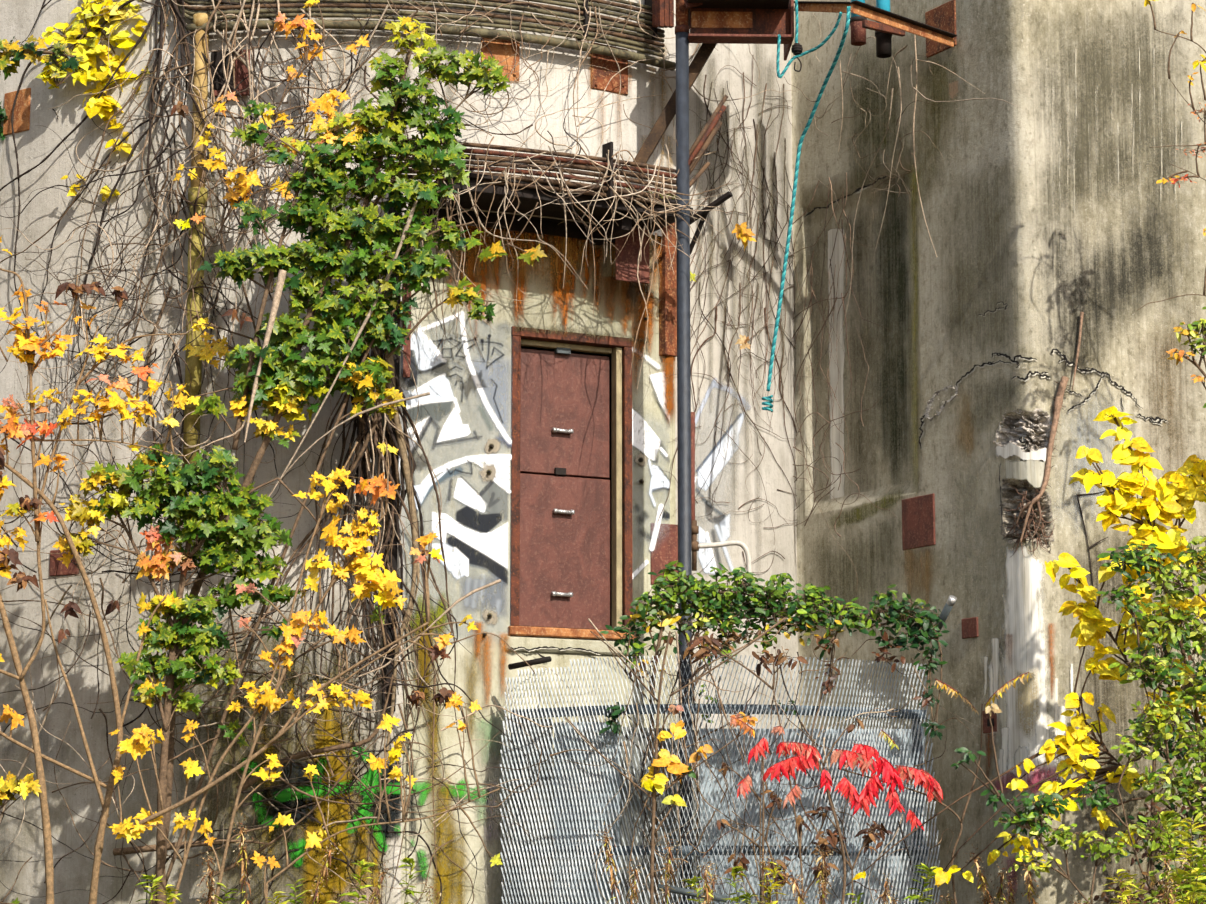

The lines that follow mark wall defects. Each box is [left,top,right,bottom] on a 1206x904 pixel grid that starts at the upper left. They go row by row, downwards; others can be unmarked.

water stain [851,52,901,179]
water stain [1041,21,1183,370]
corrosion [449,225,654,380]
corrosion [664,355,675,418]
water stain [811,169,918,499]
crack [918,415,926,451]
spalling [992,409,1054,554]
crack [956,349,1169,425]
corrosion [475,622,507,698]